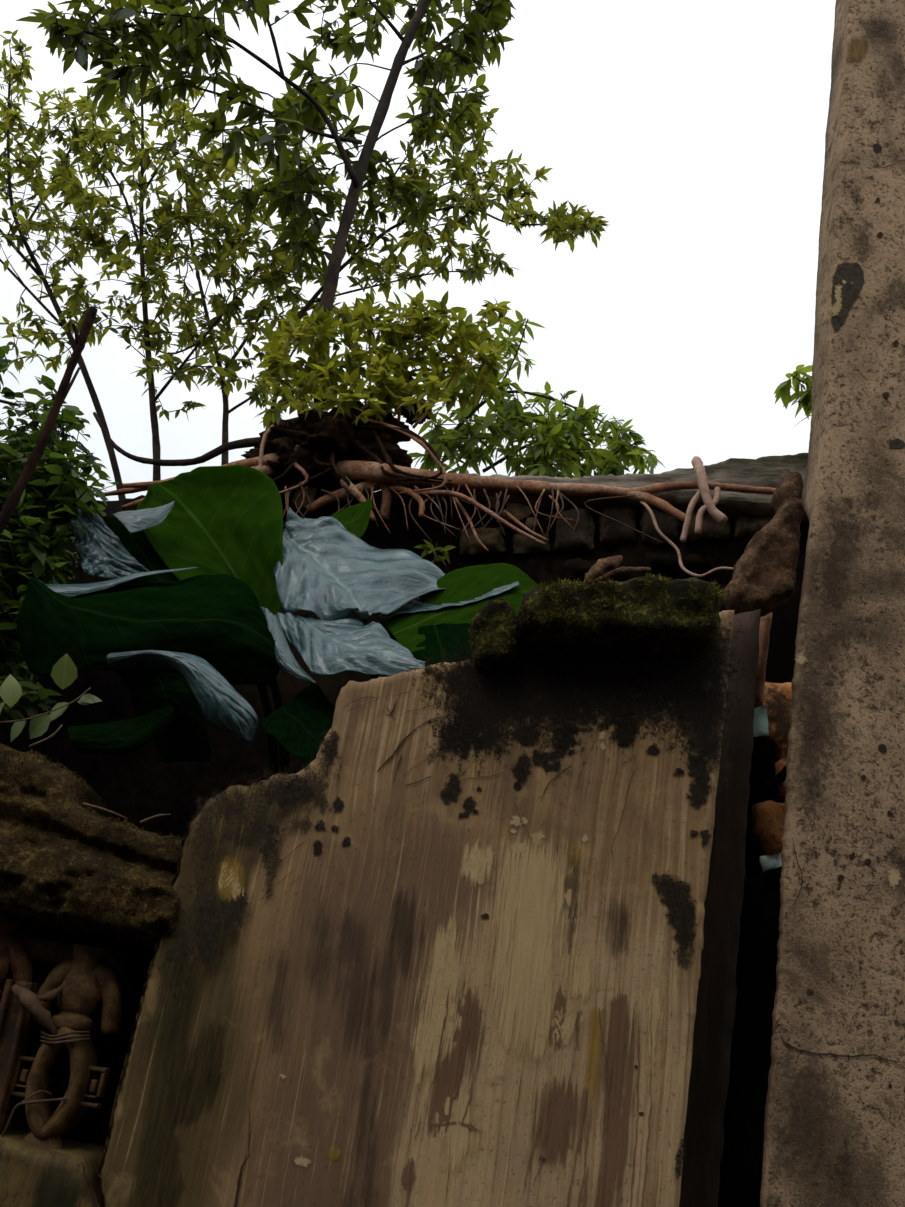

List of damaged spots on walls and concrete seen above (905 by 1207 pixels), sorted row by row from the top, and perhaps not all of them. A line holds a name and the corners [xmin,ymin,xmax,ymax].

damp [790,490,905,831]
damp [405,616,745,818]
damp [690,830,712,850]
damp [652,873,699,971]
crack [780,1036,905,1069]